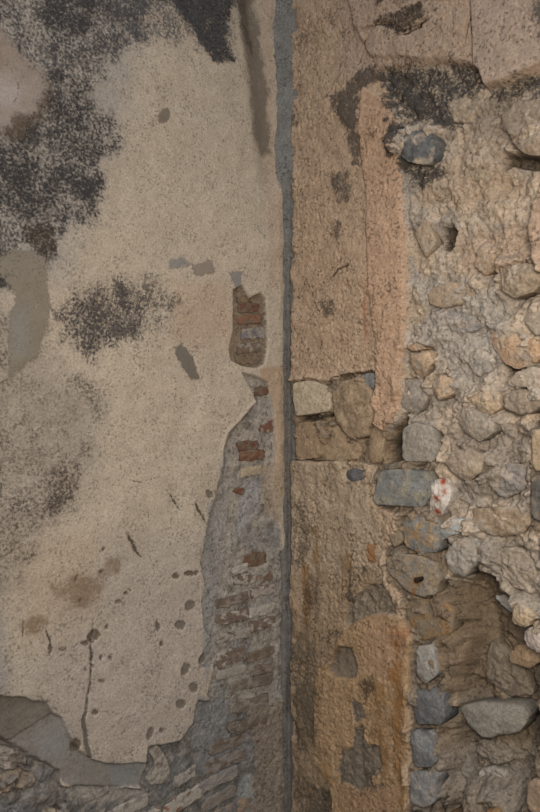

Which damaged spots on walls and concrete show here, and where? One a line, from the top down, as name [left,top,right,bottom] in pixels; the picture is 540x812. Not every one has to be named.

spalling [0,27,52,134]
leakage [0,0,270,262]
leakage [326,59,540,203]
leakage [51,273,181,363]
leakage [169,258,214,275]
spalling [289,65,540,812]
spalling [0,285,285,812]
crack [82,630,93,758]